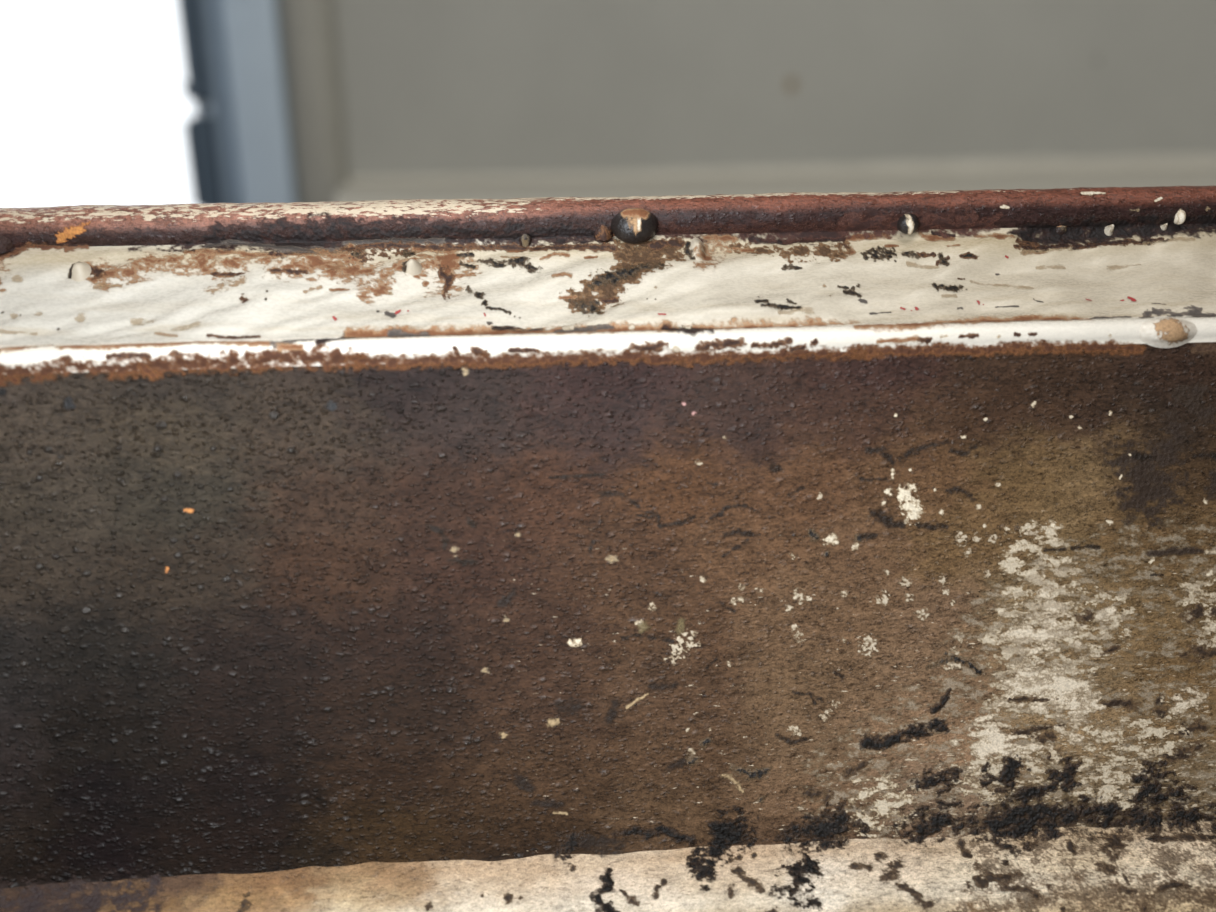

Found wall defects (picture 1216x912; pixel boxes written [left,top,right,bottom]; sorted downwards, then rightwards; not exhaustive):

rust [647,206,1216,264]
peeling [840,244,978,266]
peeling [349,245,539,325]
peeling [559,239,686,315]
peeling [754,296,802,310]
peeling [823,284,891,315]
rust [0,315,1146,387]
rust [1191,344,1216,354]
leakage [619,878,667,906]
leakage [731,866,765,894]
leakage [1000,884,1051,899]
leakage [1119,873,1138,895]